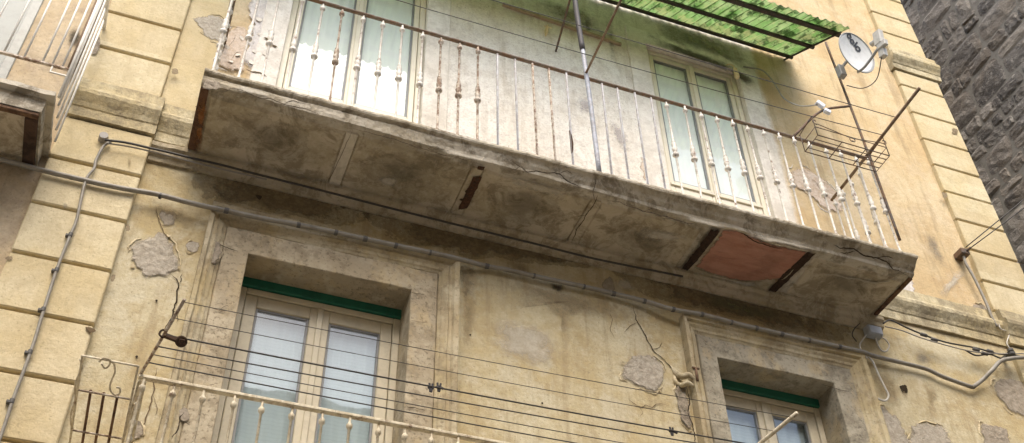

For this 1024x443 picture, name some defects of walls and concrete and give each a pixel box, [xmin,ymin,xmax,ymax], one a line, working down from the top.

peeling [193,0,277,90]
damp [549,6,591,29]
crack [514,163,694,241]
peeling [126,210,224,278]
flaking render [688,216,811,283]
crack [835,245,908,276]
crack [164,274,182,329]
crack [610,309,696,441]
peeling [619,355,694,433]
peeling [880,403,952,443]
peeling [978,421,1010,443]